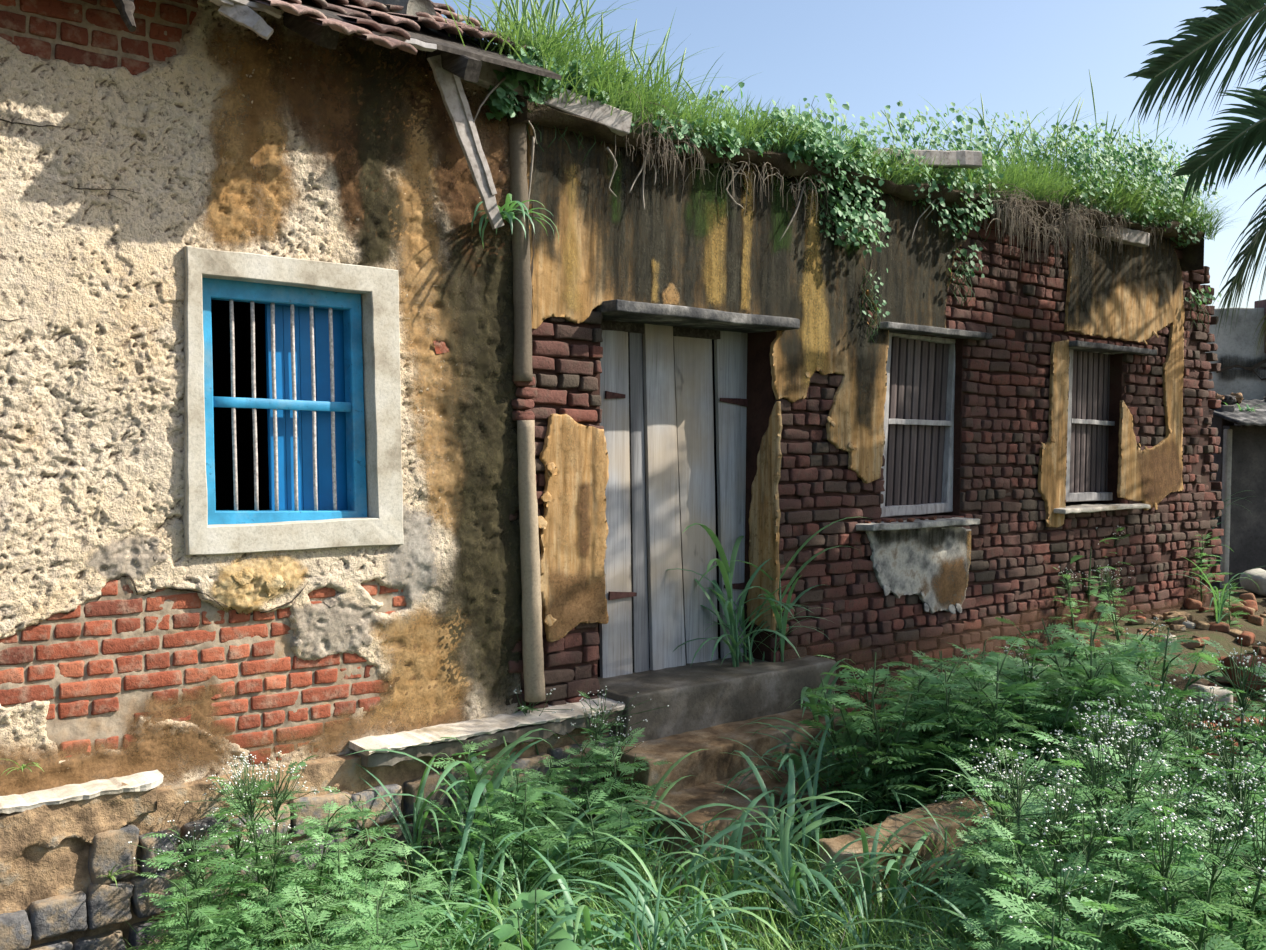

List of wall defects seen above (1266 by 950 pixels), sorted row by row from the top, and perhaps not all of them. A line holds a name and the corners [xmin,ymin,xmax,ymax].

flaking render [0,0,198,75]
flaking render [0,536,407,765]
water stain [206,18,522,666]
flaking render [538,414,609,642]
water stain [577,483,591,556]
flaking render [527,124,760,329]
water stain [527,123,975,429]
flaking render [747,258,889,631]
flaking render [866,526,971,614]
water stain [873,527,969,549]
flaking render [1038,235,1185,528]